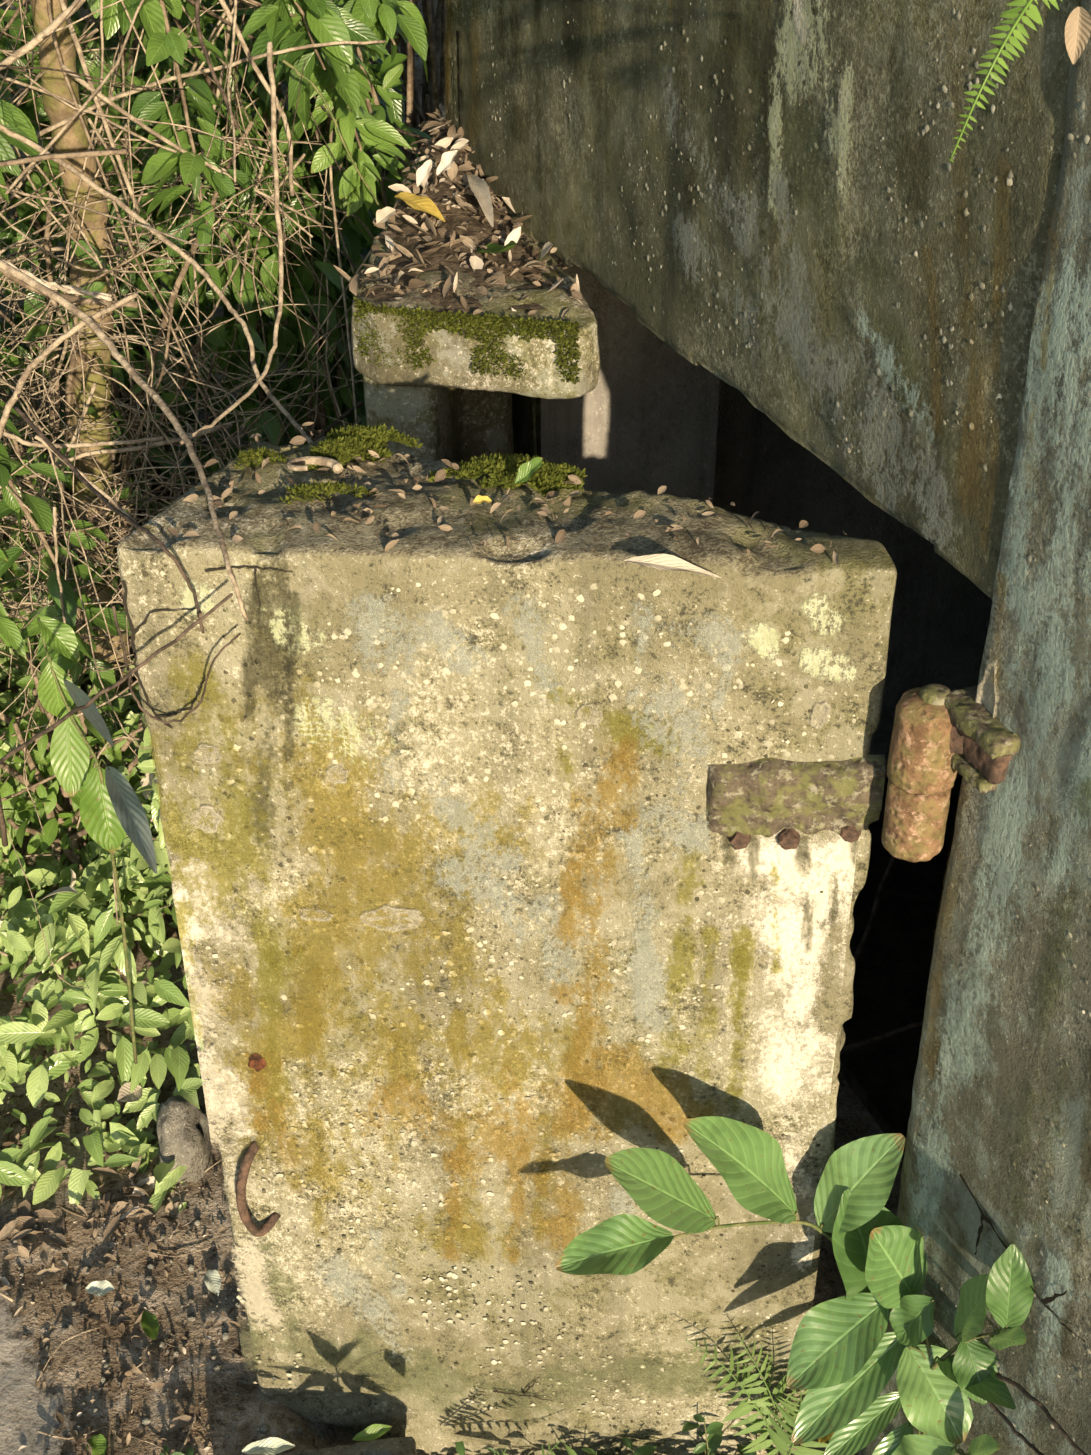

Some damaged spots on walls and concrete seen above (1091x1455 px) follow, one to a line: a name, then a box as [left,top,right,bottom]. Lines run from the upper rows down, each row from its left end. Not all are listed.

water stain [857,312,934,441]
crack [959,1173,1008,1255]
crack [1030,1285,1085,1342]